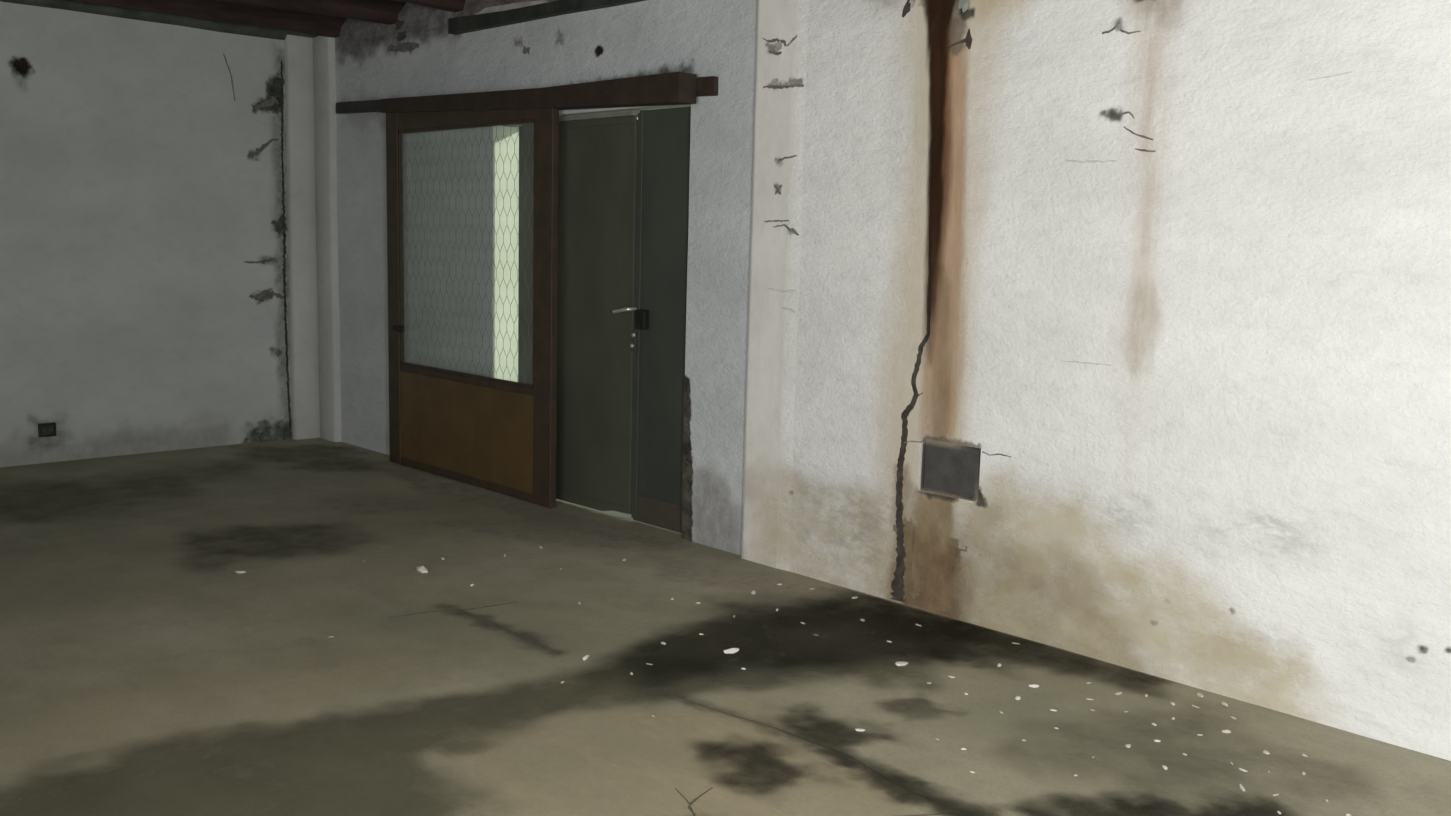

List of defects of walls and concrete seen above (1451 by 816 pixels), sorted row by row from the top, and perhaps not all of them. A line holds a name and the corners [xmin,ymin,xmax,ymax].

flaking render [388,19,419,52]
flaking render [902,0,927,18]
flaking render [946,0,998,54]
hole [11,58,31,77]
rust [924,0,965,441]
water stain [245,421,289,443]
crack [889,253,931,602]
rust [907,493,955,617]
water stain [0,500,1296,816]